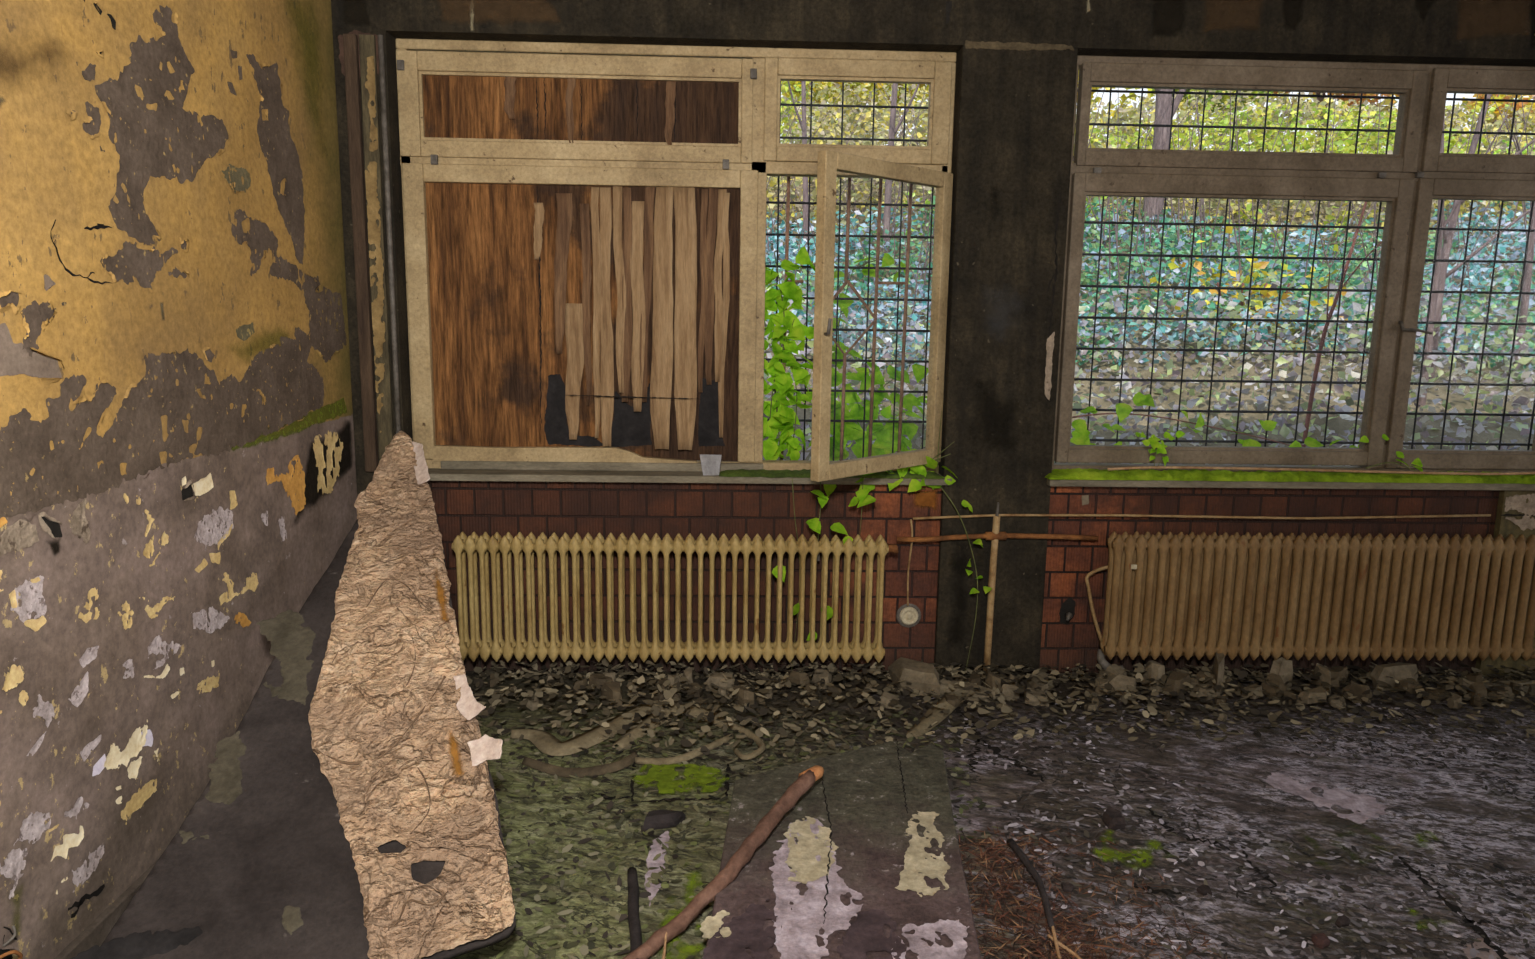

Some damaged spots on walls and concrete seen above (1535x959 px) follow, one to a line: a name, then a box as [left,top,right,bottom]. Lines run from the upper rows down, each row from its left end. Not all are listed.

spalling [84,0,116,30]
peeling [0,5,347,594]
peeling [9,590,47,632]
peeling [78,607,100,623]
peeling [118,597,149,630]
flaking render [0,925,23,959]